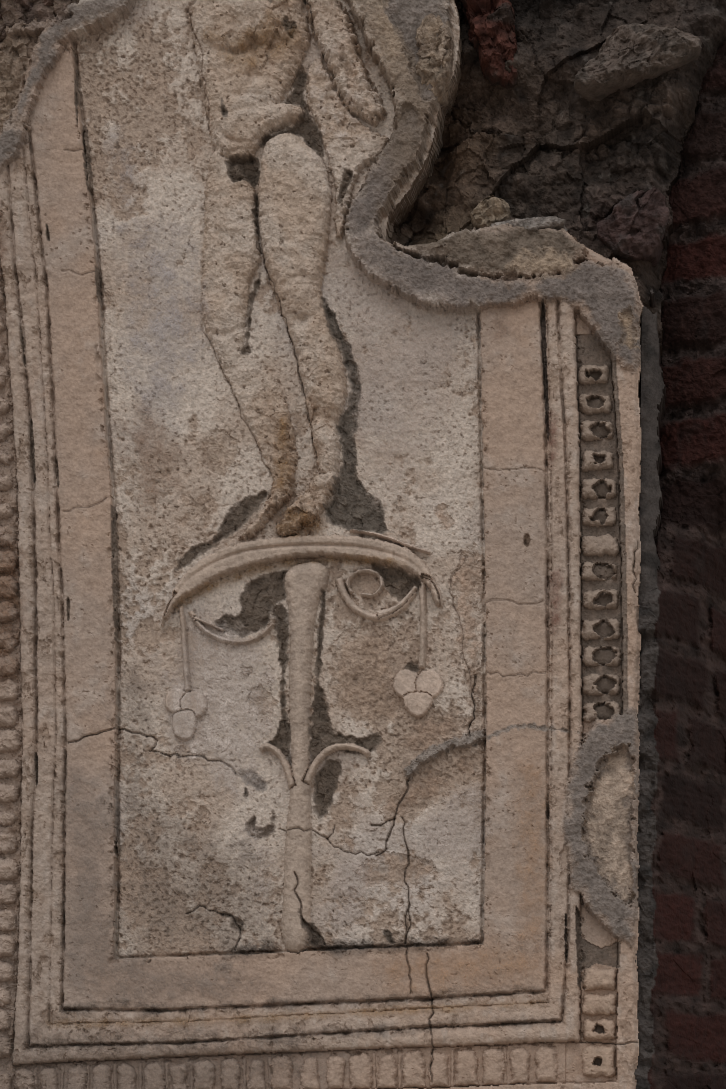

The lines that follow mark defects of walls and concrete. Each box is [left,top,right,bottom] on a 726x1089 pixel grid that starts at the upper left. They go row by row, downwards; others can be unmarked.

flaking render [0,19,38,135]
spalling [75,70,94,194]
spalling [224,65,325,254]
spalling [281,16,298,40]
spalling [337,168,354,206]
spalling [95,266,103,305]
flaking render [390,223,589,280]
spalling [110,505,120,644]
crack [69,728,236,775]
crack [280,557,581,1082]
flaking render [581,742,639,910]
crack [186,905,241,951]